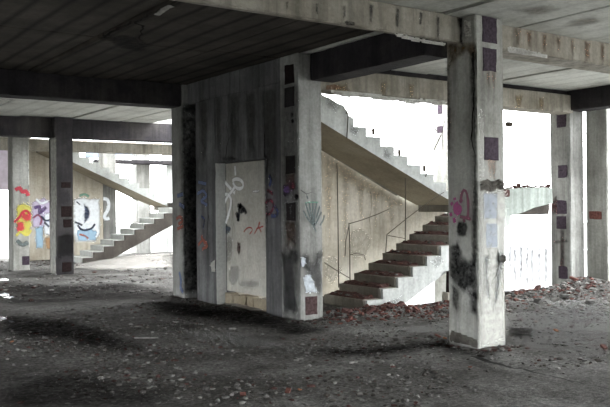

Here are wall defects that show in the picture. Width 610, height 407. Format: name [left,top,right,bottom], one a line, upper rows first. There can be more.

crack [468,52,476,163]
peeling [480,179,507,343]